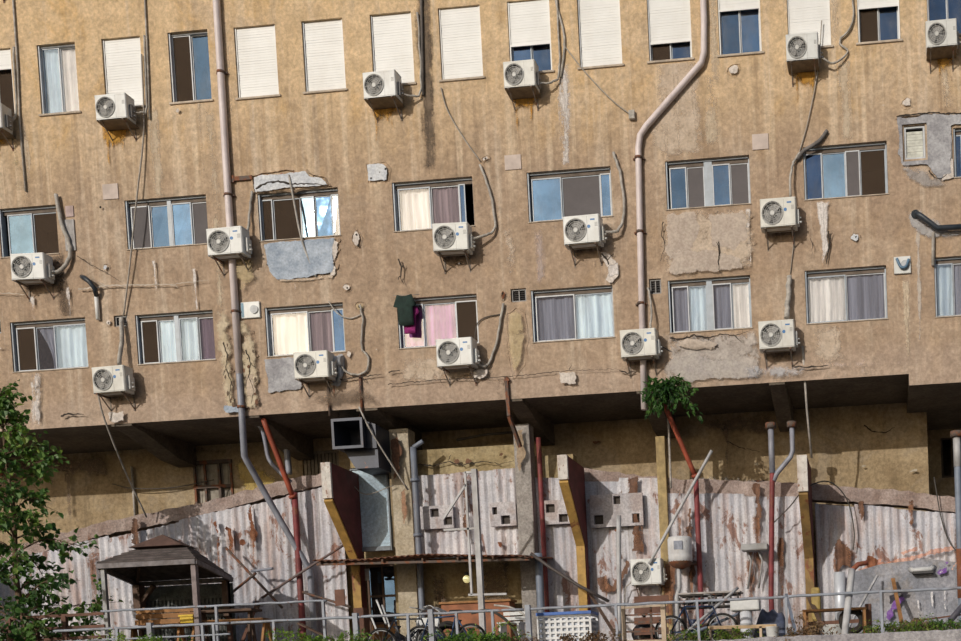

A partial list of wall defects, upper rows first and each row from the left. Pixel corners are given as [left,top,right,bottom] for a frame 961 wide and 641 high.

damp [416,0,435,168]
flaking render [251,169,332,194]
peeling [660,209,757,275]
crack [223,343,255,402]
peeling [665,330,761,382]
rust [628,476,639,493]
rust [213,505,258,570]
rust [597,513,644,596]
rust [833,539,852,572]